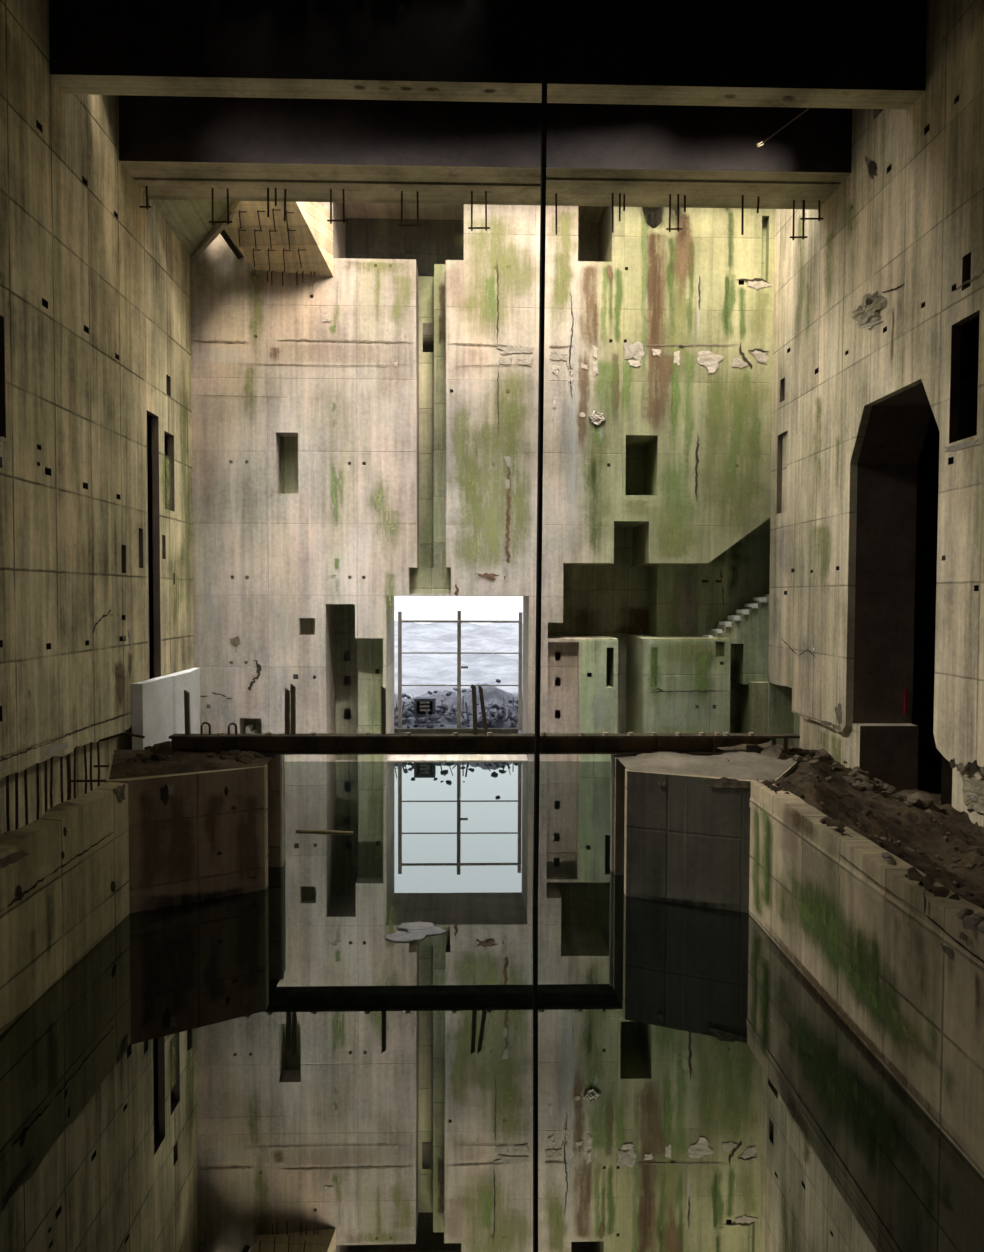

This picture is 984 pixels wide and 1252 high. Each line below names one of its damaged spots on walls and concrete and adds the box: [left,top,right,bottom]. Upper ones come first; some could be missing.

water stain [466,221,531,322]
corrosion [578,357,589,442]
corrosion [581,266,612,343]
spalling [623,342,680,367]
corrosion [646,215,692,427]
spalling [697,350,769,374]
water stain [455,376,527,564]
corrosion [472,456,512,583]
crack [693,435,701,502]
spalling [0,732,145,832]
spalling [949,758,984,815]
water stain [753,810,783,917]